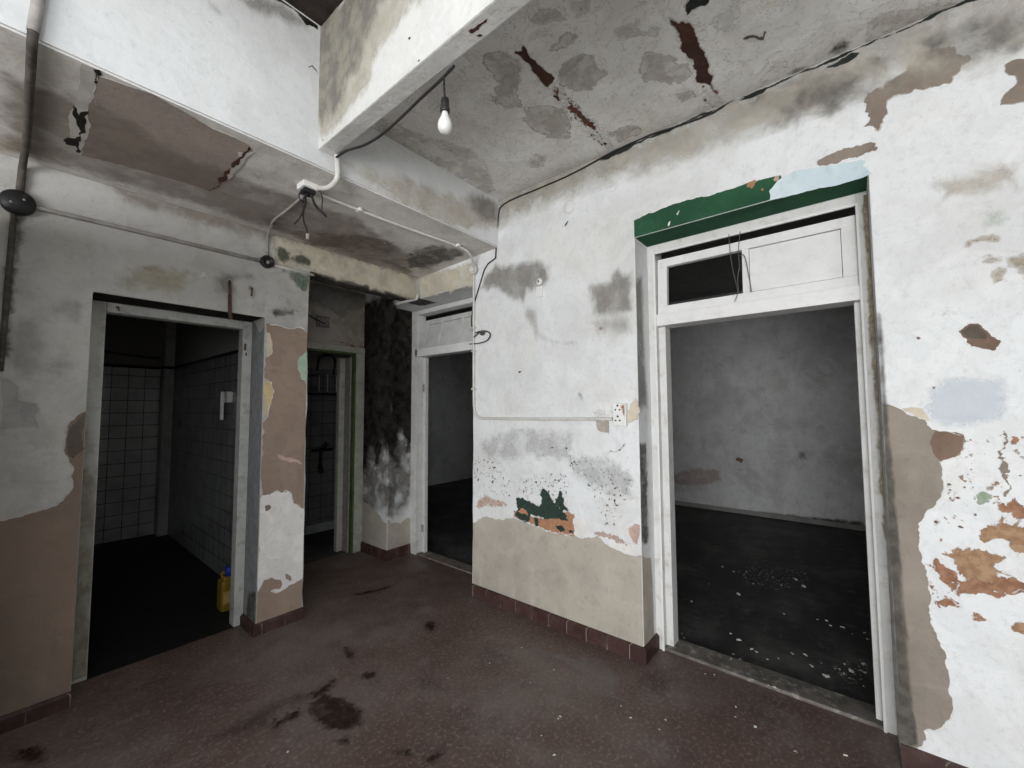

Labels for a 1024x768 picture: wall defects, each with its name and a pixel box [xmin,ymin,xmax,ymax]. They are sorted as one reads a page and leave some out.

spalling [63,64,254,191]
crack [601,0,976,160]
peeling [816,46,971,167]
damp [13,90,546,517]
flaking render [956,321,1003,352]
peeling [261,323,308,511]
damp [71,547,93,682]
damp [80,471,96,537]
peeling [256,574,303,624]
peeling [473,495,643,647]
peeling [883,404,1024,748]